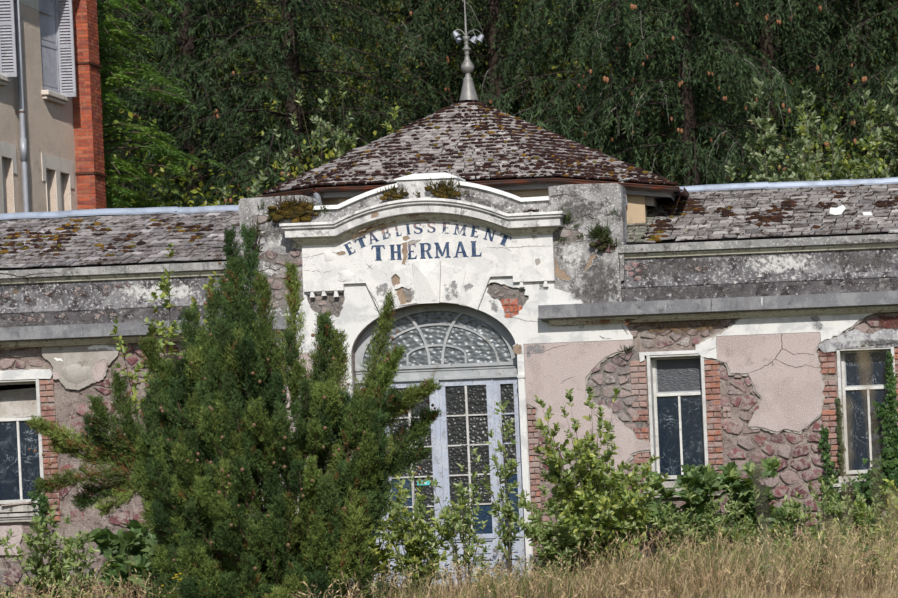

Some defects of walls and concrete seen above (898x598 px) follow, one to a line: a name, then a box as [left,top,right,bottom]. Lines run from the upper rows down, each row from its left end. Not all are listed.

water stain [745,254,817,273]
water stain [830,239,898,268]
water stain [116,284,194,302]
flaking render [392,274,412,305]
spalling [487,282,529,318]
spalling [0,351,43,369]
crack [750,335,818,373]
spalling [70,344,154,432]
spalling [587,319,731,496]
spalling [39,372,111,523]
spalling [704,351,840,537]
spalling [527,405,565,556]